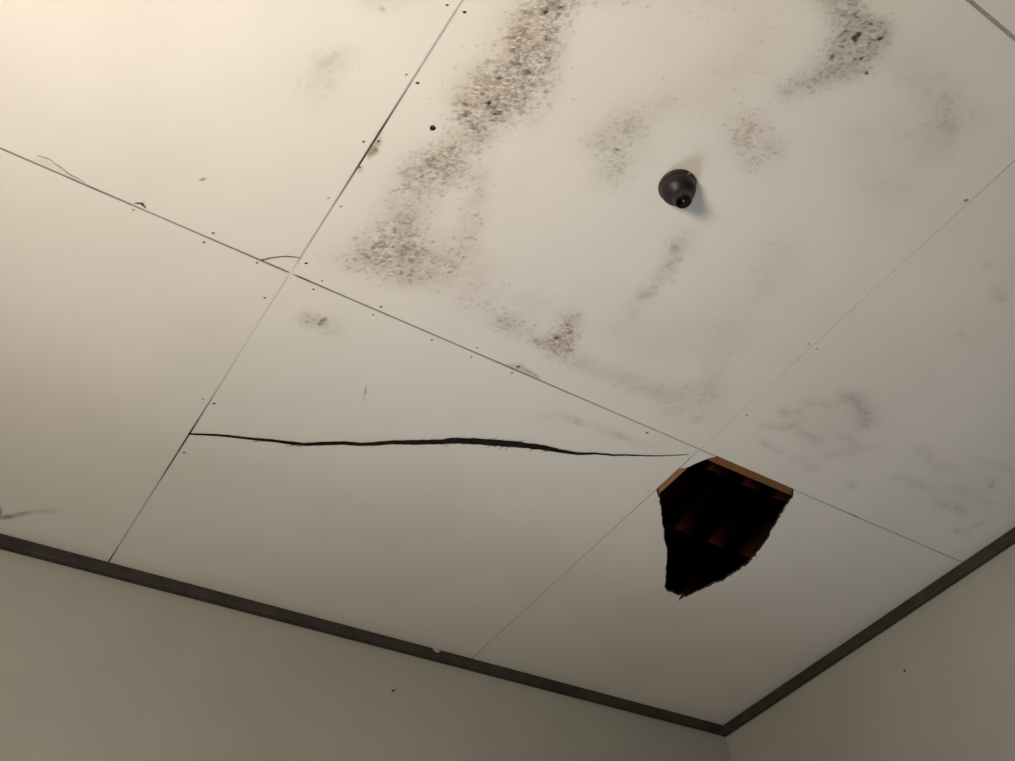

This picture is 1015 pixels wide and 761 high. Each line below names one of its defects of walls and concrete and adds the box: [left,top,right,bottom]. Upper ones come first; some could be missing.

damp [336,0,600,293]
crack [189,433,689,456]
spalling [657,489,794,600]